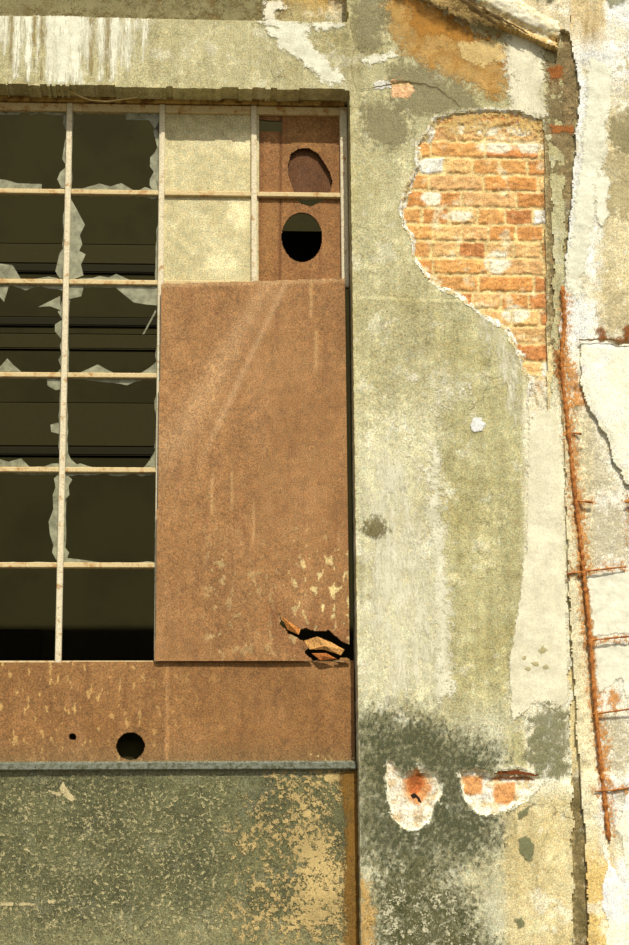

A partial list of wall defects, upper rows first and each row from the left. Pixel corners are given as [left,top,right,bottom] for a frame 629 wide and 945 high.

water stain [0,0,283,85]
rust [547,65,564,81]
water stain [348,0,629,352]
rust [549,124,574,134]
water stain [480,316,525,424]
spalling [398,107,629,945]
rust [553,293,629,837]
water stain [359,438,589,945]
spalling [383,757,445,854]